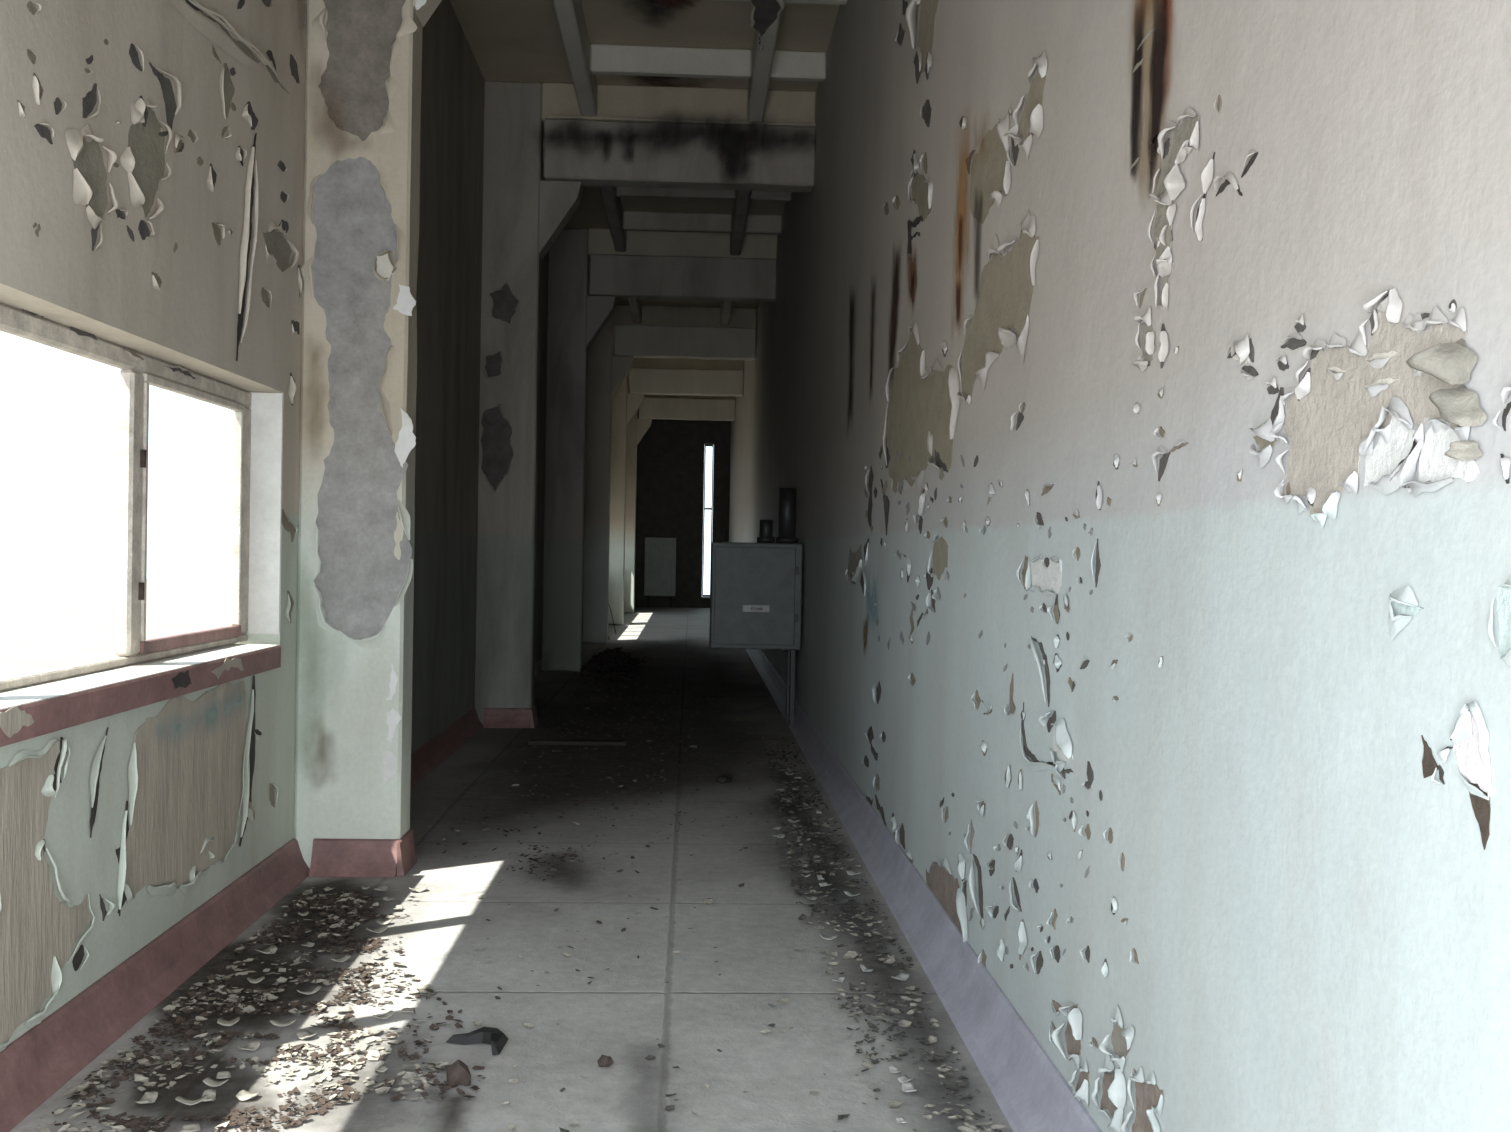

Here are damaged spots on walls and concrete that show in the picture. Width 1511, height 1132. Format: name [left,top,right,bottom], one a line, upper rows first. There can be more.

peeling [16,39,217,252]
crack [169,0,289,361]
corrosion [1130,0,1170,184]
peeling [70,327,97,340]
spalling [261,0,427,649]
peeling [845,50,1048,650]
peeling [1113,426,1189,506]
peeling [1227,288,1480,528]
peeling [0,707,95,1052]
peeling [862,481,1125,977]
peeling [1421,700,1493,850]
peeling [1049,1000,1164,1132]